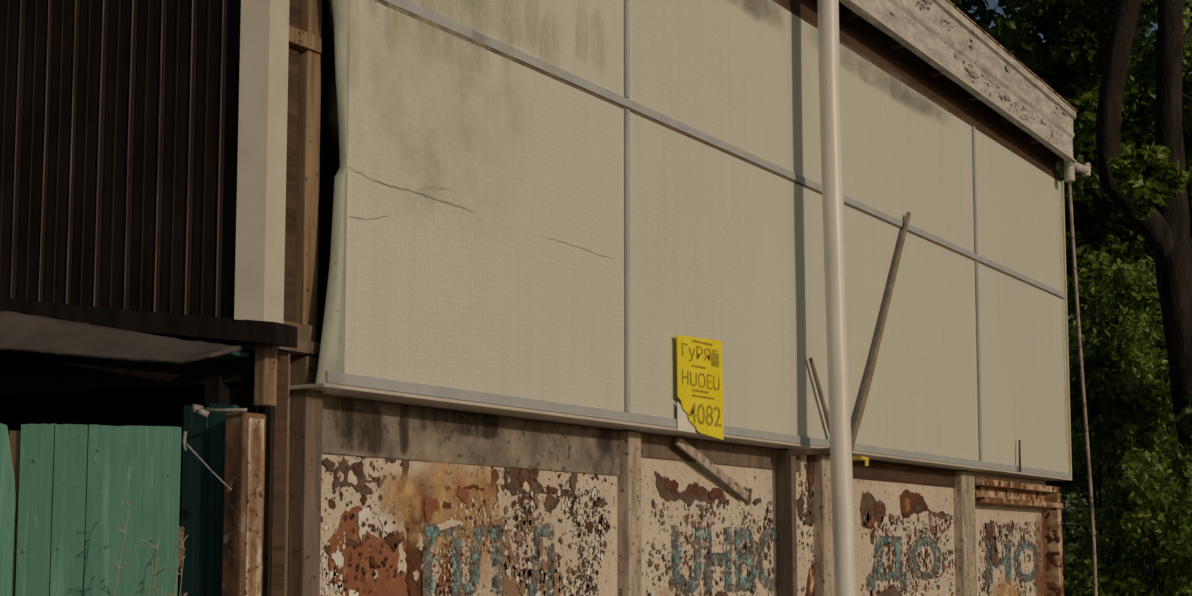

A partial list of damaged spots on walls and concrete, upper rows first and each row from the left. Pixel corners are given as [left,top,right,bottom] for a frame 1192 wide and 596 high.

peeling [320,456,616,596]
peeling [647,471,775,596]
peeling [860,489,955,596]
peeling [979,520,1042,596]